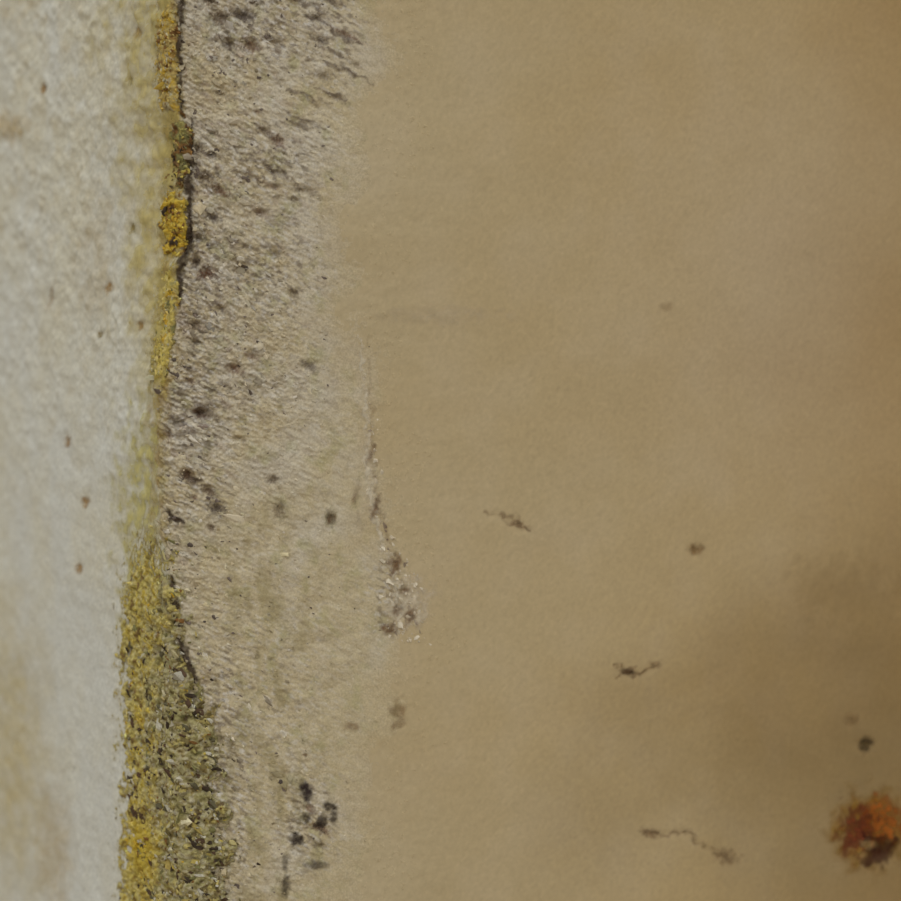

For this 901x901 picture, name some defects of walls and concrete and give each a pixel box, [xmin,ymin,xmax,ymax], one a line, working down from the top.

spalling [153,0,468,901]
rust [832,792,901,867]